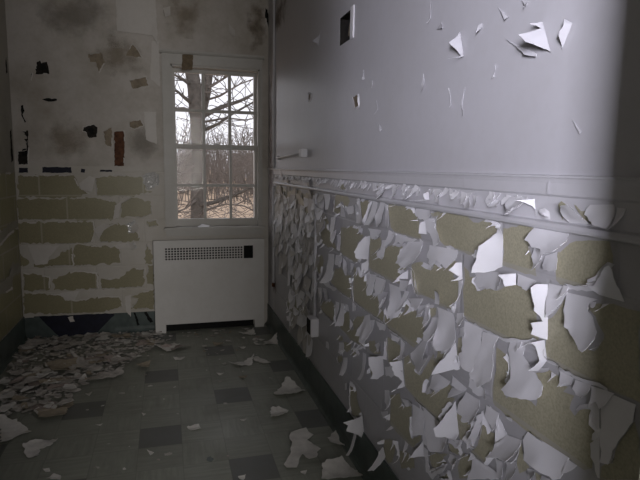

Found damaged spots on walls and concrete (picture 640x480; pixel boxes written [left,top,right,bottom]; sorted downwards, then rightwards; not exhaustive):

peeling [448,31,465,59]
peeling [507,21,552,57]
peeling [0,172,159,341]
peeling [273,171,640,480]